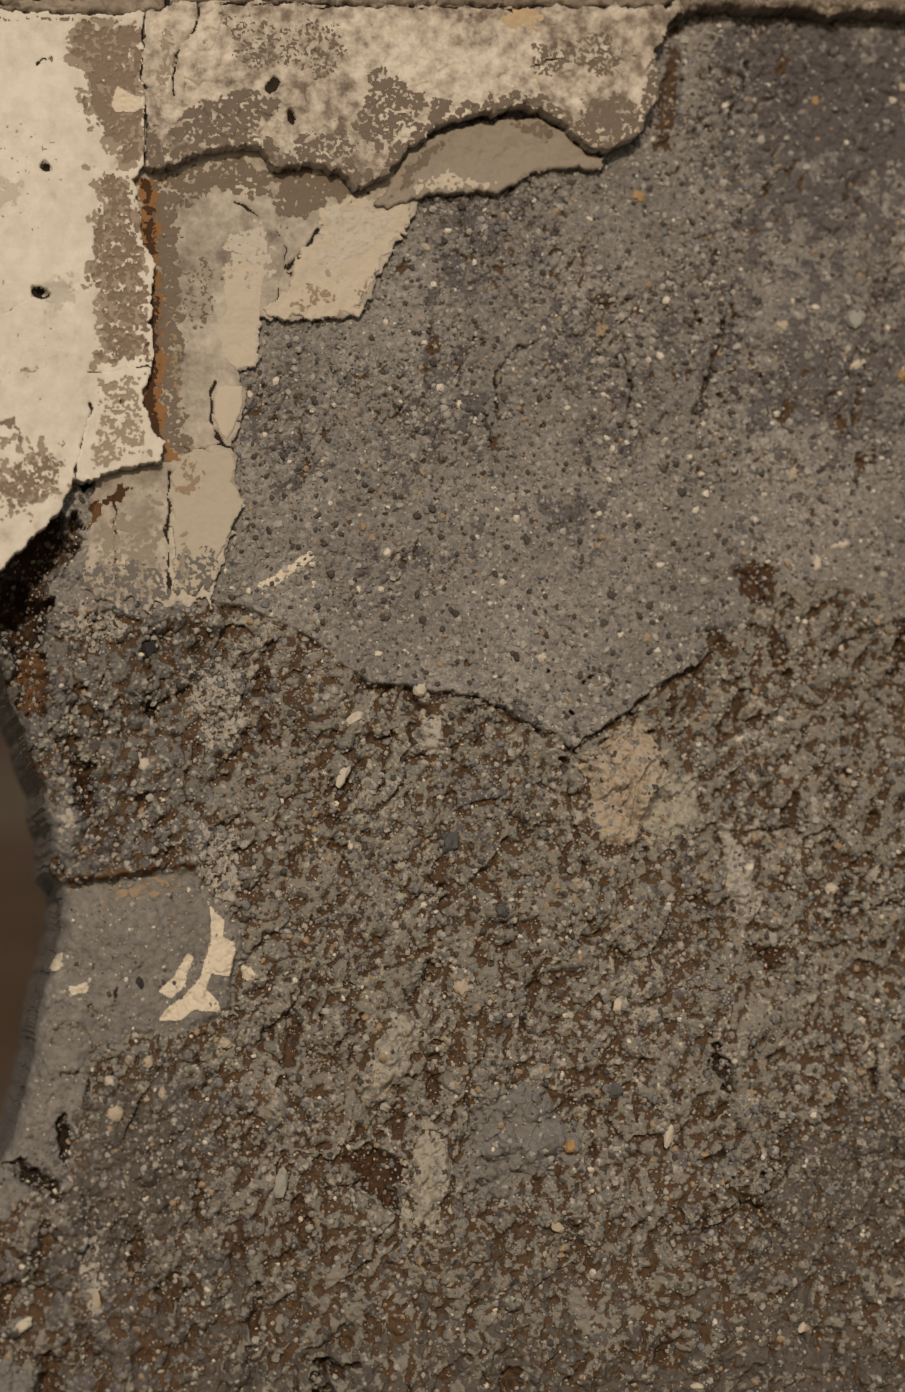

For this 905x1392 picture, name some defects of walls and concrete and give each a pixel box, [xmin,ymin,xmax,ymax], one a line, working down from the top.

flaking render [0,0,685,470]
crack [111,502,119,585]
spalling [0,385,905,1392]